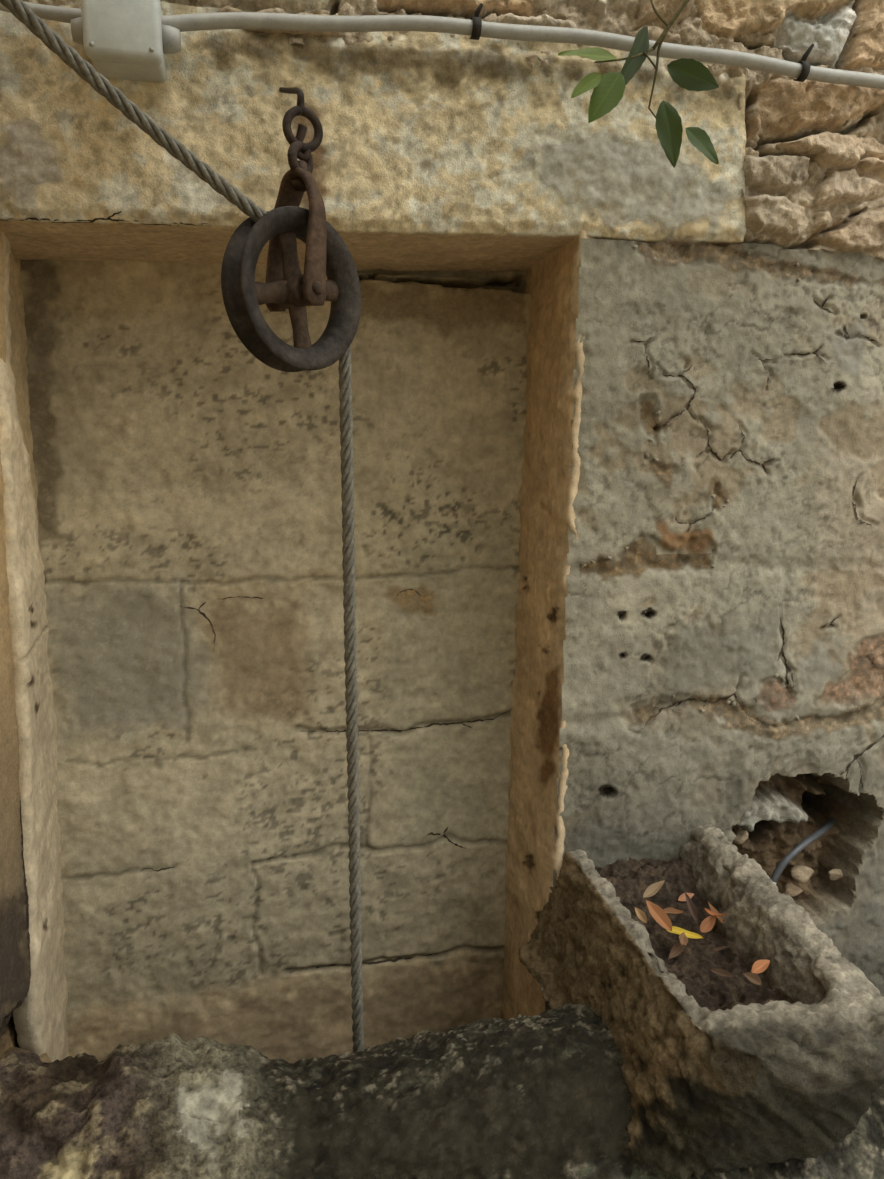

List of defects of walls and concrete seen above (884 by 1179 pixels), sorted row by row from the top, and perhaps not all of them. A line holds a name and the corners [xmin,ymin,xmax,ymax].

crack [633,337,775,473]
crack [628,675,783,733]
spalling [731,772,883,925]